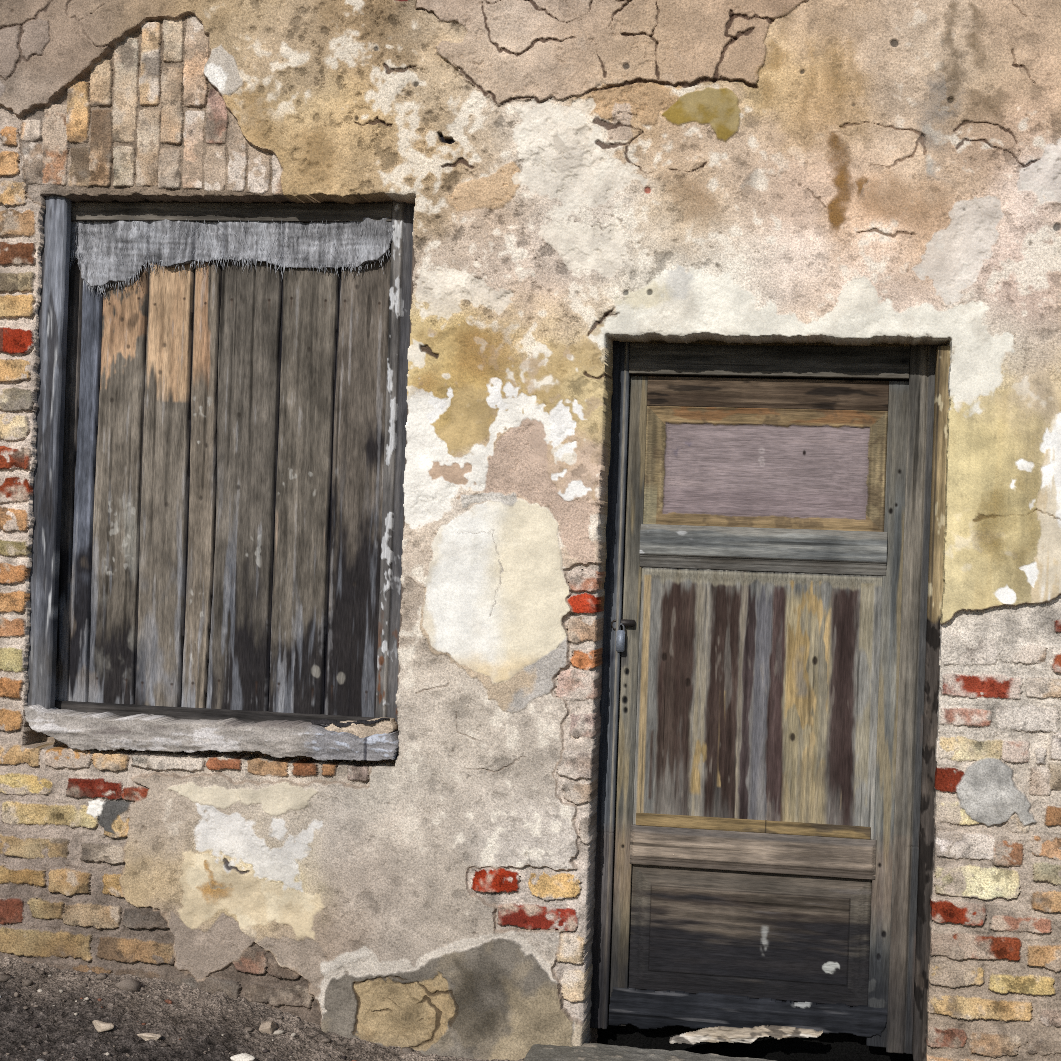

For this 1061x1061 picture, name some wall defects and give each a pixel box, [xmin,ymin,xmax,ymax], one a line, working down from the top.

crack [415,3,442,23]
crack [383,63,417,75]
crack [439,0,776,176]
crack [354,118,393,128]
peeling [513,83,741,278]
crack [839,121,928,170]
crack [954,119,1041,169]
peeling [1017,139,1061,204]
crack [856,228,916,239]
spalling [0,11,372,1030]
spalling [403,196,1061,1061]
spalling [354,972,456,1052]